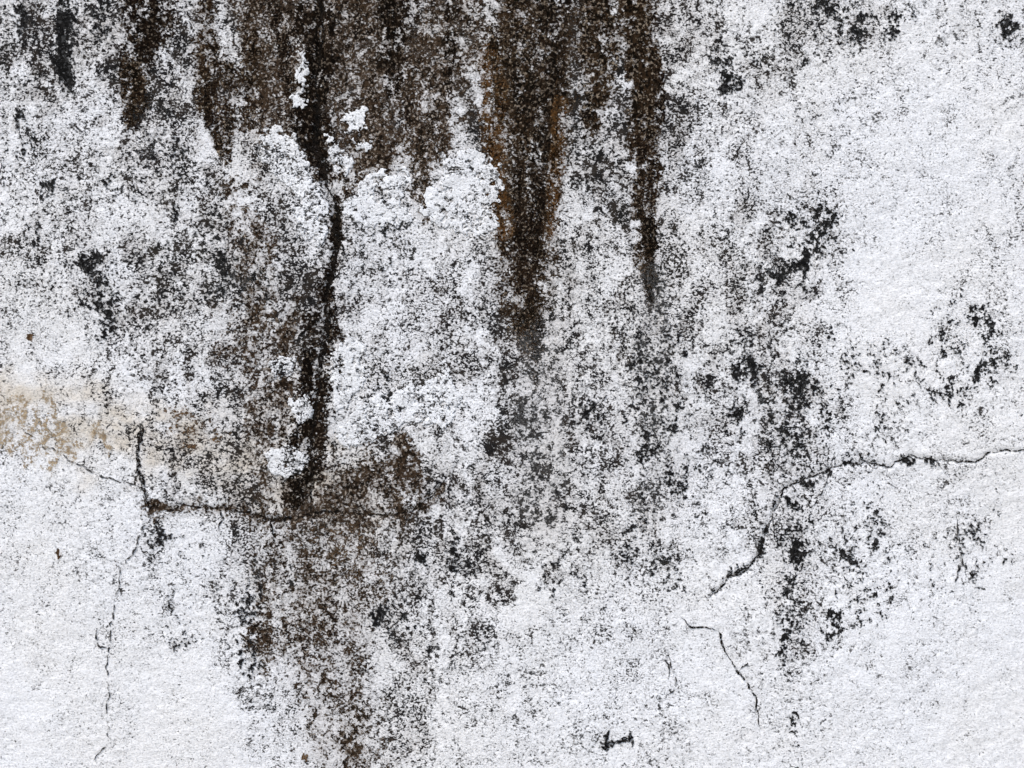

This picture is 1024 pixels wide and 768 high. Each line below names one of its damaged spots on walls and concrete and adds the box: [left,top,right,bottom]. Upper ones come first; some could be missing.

damp [0,98,41,187]
damp [21,167,68,247]
damp [63,236,126,348]
damp [50,0,188,207]
damp [744,167,857,344]
damp [0,381,113,480]
damp [147,513,205,572]
crack [20,0,456,760]
damp [189,0,719,768]
crack [706,449,1024,598]
damp [713,288,1018,681]
crack [681,617,761,729]